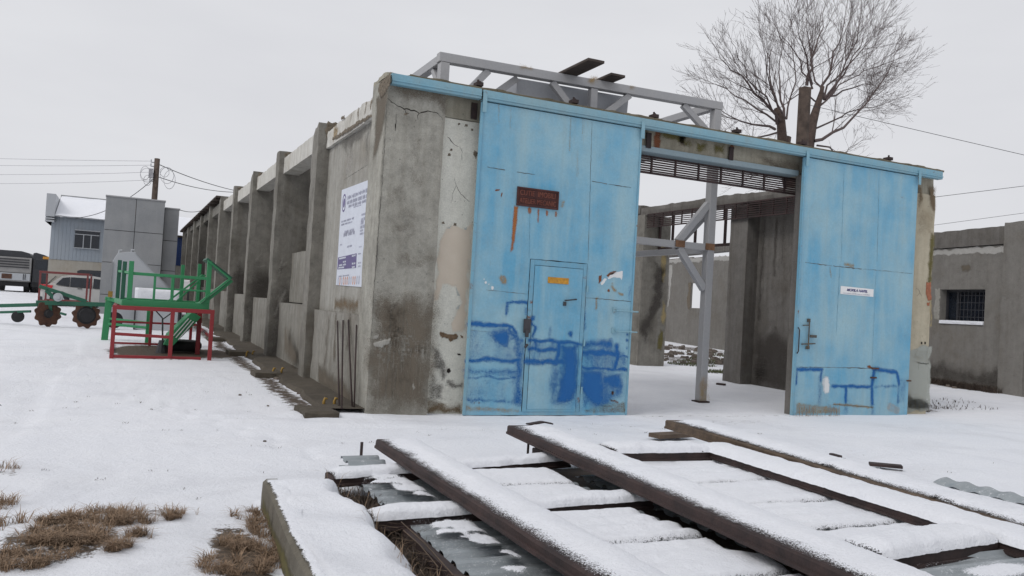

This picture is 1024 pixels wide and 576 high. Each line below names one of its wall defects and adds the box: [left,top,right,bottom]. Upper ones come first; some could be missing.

damp [225,252,462,415]
crack [344,100,462,321]
peeling [434,222,473,342]
rust [510,200,565,250]
peeling [599,271,624,296]
damp [640,262,667,342]